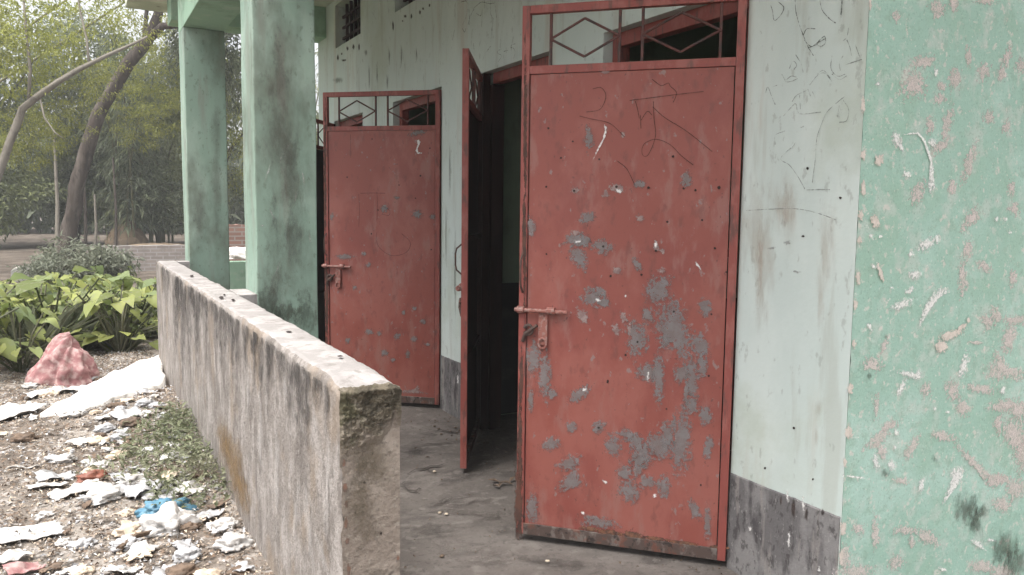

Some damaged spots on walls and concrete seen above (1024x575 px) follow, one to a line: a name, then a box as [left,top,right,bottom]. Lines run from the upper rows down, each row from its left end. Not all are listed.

peeling [896,43,1024,157]
peeling [562,212,615,273]
water stain [161,266,328,425]
peeling [526,335,557,410]
peeling [570,384,592,402]
peeling [576,257,713,506]
peeling [891,305,1024,514]
peeling [542,421,587,492]
peeling [688,498,711,540]
peeling [832,511,941,575]